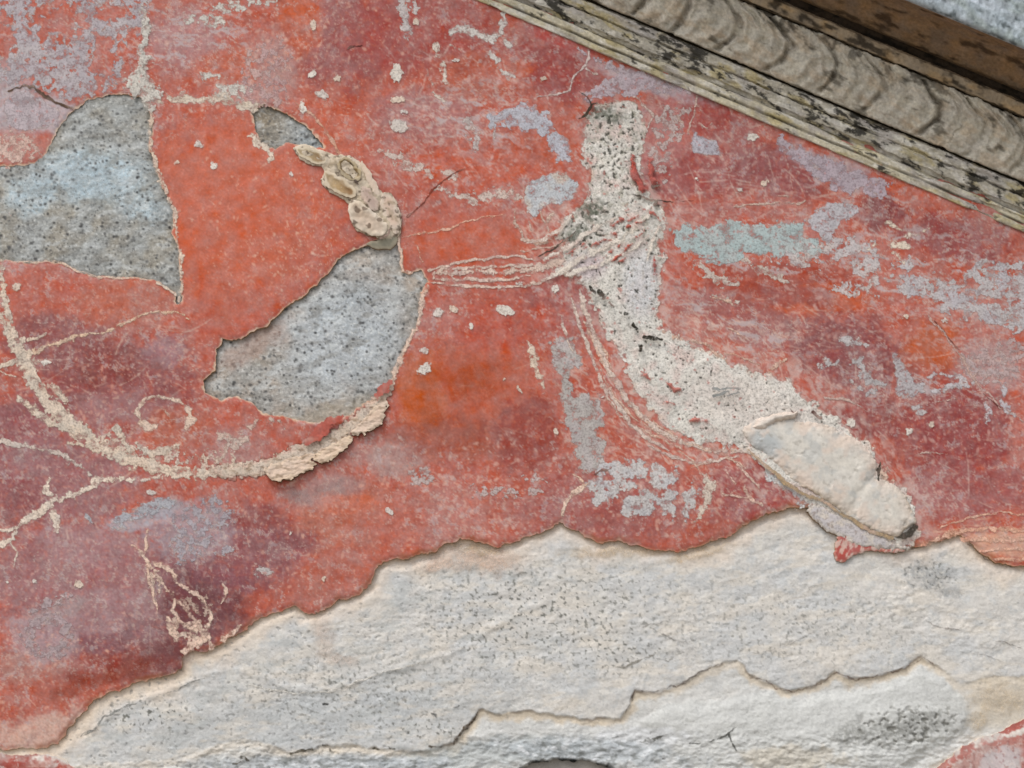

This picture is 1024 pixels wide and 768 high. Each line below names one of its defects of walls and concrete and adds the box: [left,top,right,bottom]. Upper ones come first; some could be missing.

crack [7,84,75,110]
peeling [647,105,691,176]
peeling [691,132,720,155]
flaking render [0,0,434,485]
peeling [669,202,884,298]
flaking render [571,298,598,371]
flaking render [579,289,629,402]
peeling [549,336,679,521]
peeling [470,473,548,499]
flaking render [675,445,759,488]
peeling [112,490,235,566]
peeling [166,594,213,641]